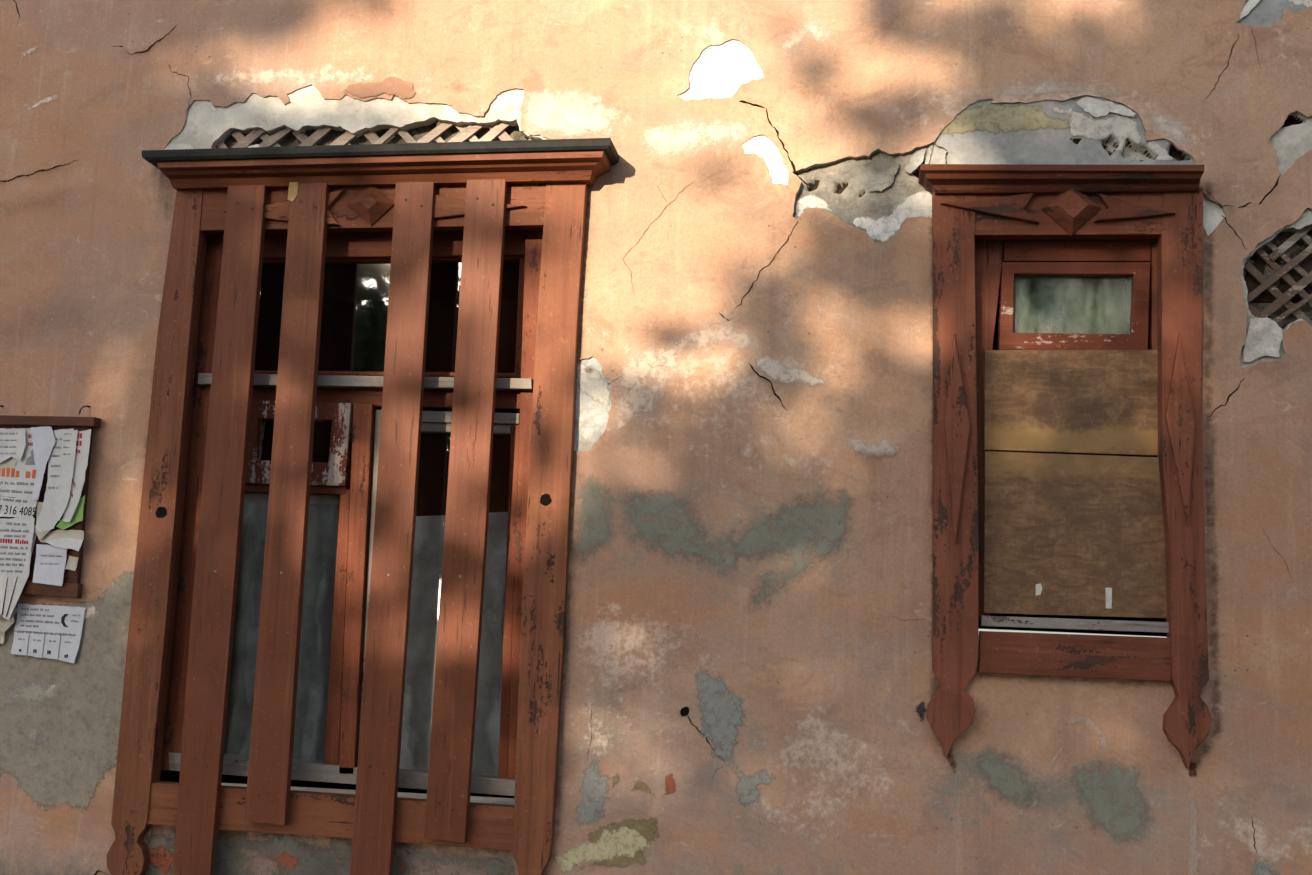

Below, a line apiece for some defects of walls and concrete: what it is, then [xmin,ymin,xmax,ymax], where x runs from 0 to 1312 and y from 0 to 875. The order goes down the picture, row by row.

spalling [1237,0,1312,28]
crack [0,160,77,182]
peeling [168,77,611,149]
spalling [677,40,764,101]
crack [739,100,810,186]
flaking render [644,85,1195,243]
spalling [1269,113,1312,181]
crack [623,183,692,285]
crack [609,221,798,384]
flaking render [1240,209,1312,368]
peeling [574,323,823,451]